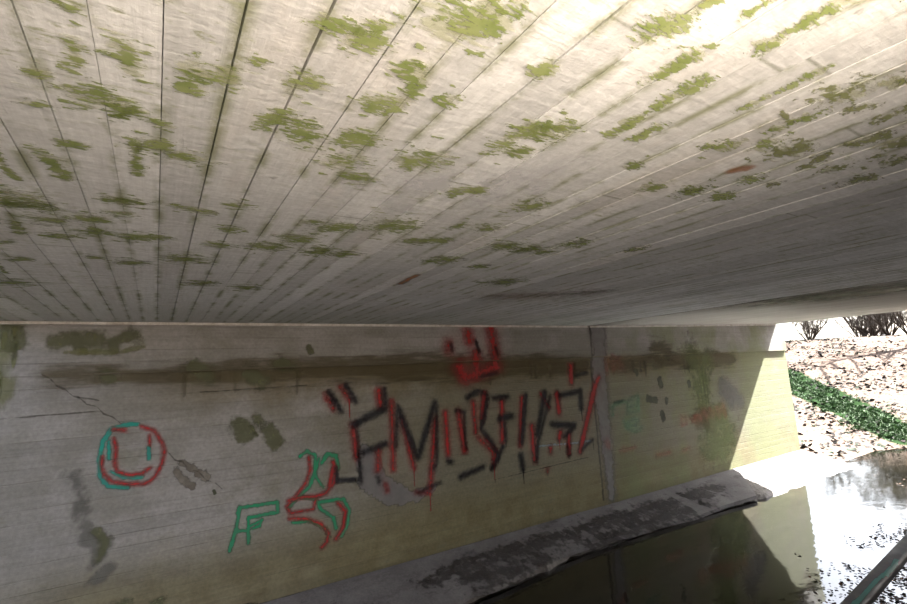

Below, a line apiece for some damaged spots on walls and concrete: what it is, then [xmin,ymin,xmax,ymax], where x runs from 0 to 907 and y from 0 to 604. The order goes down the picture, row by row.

damp [69,470,115,585]